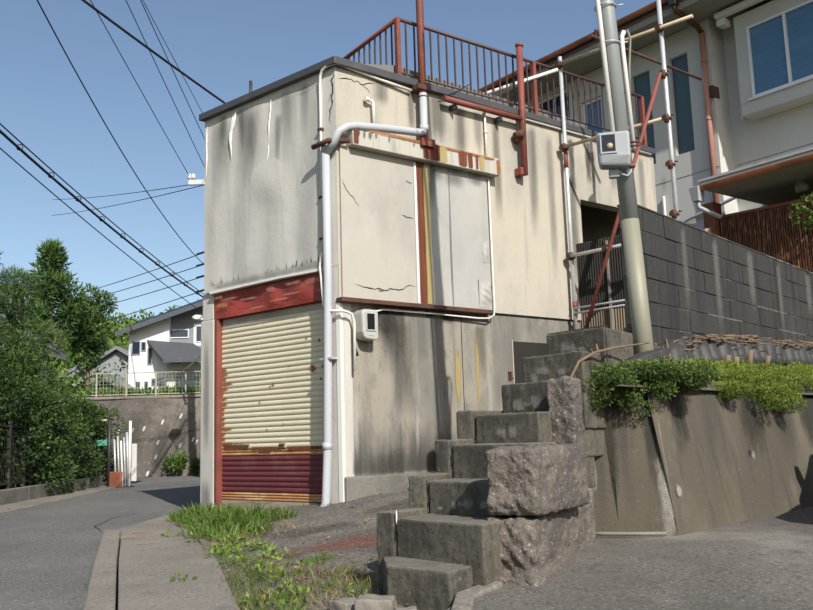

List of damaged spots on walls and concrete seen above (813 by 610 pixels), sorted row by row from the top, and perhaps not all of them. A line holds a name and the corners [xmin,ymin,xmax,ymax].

corrosion [370,130,500,304]
water stain [371,309,393,333]
corrosion [222,368,232,446]